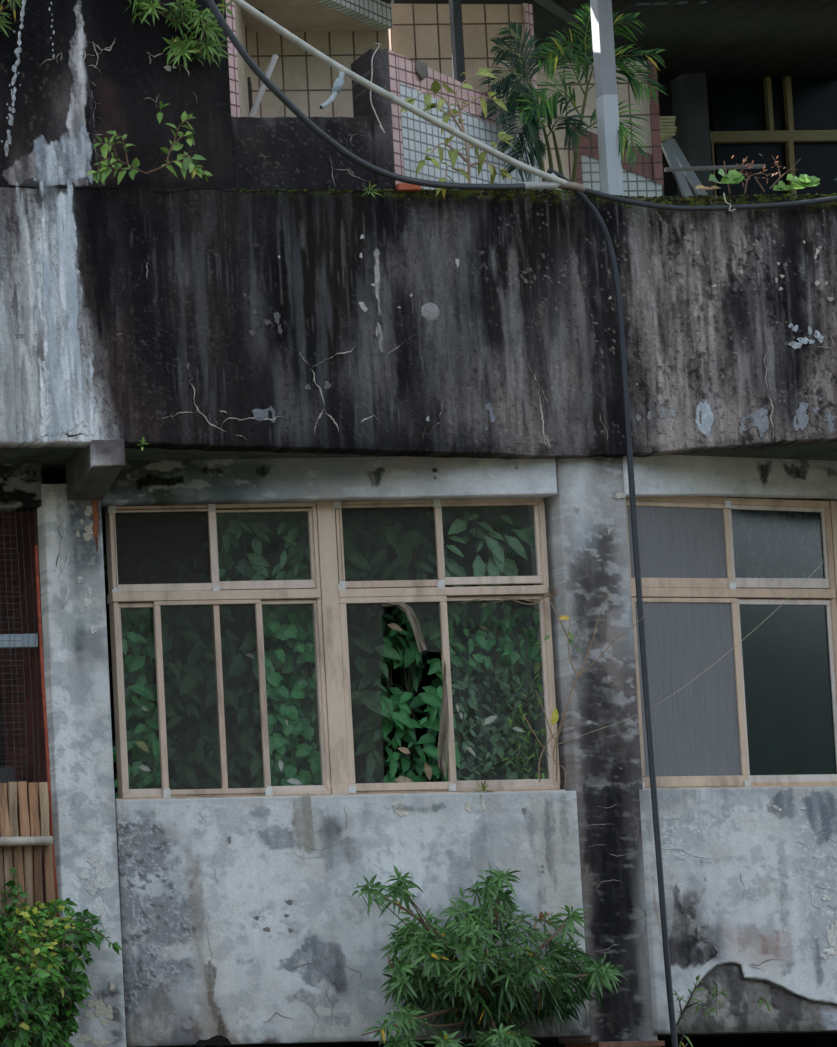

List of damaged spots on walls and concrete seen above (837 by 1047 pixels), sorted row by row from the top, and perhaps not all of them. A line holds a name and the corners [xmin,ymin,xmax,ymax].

water stain [0,5,114,441]
water stain [374,249,388,369]
water stain [572,253,595,396]
crack [158,379,285,436]
crack [299,346,390,434]
peeling [695,399,715,438]
peeling [740,407,770,438]
peeling [793,396,835,433]
water stain [578,674,633,946]
spalling [676,963,837,1033]